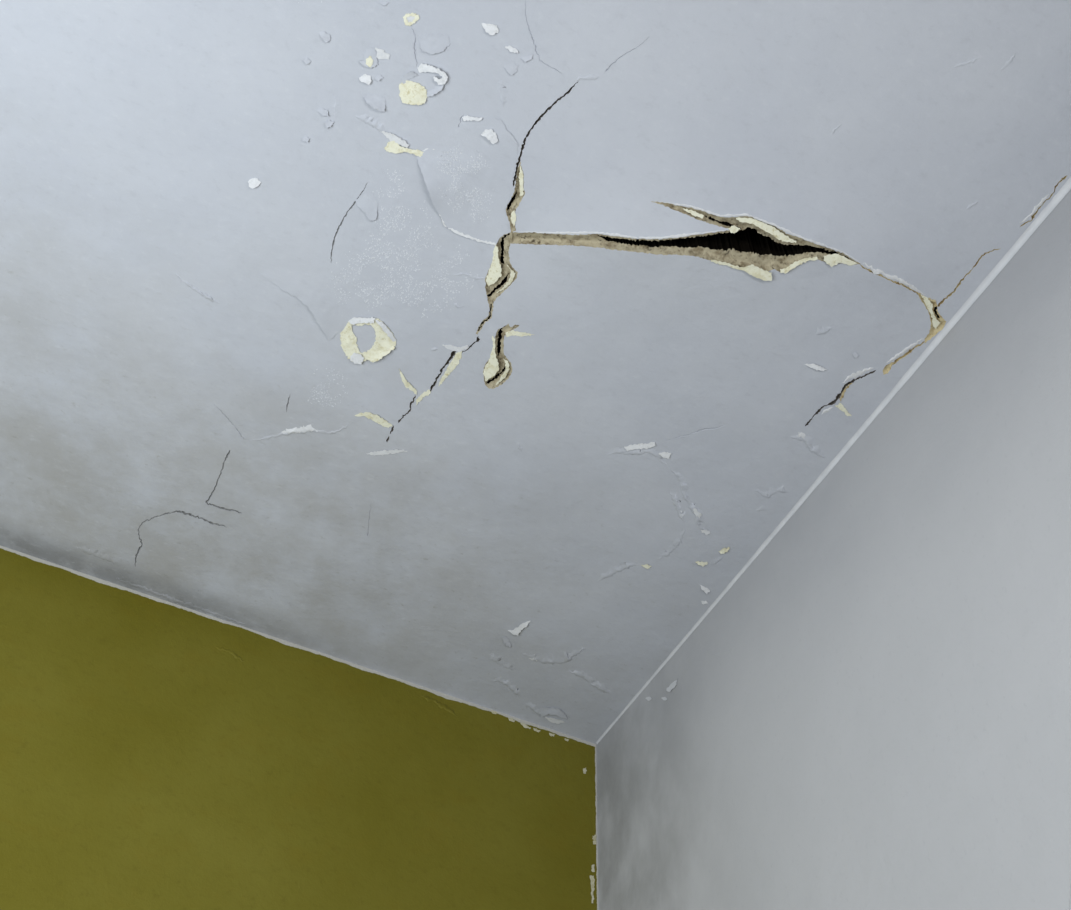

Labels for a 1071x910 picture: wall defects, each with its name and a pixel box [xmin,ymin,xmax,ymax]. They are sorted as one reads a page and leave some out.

peeling [482,23,499,35]
peeling [359,47,390,85]
peeling [355,113,518,245]
crack [386,0,1001,442]
crack [1019,176,1067,235]
peeling [607,442,672,468]
crack [135,404,244,566]
peeling [508,621,530,636]